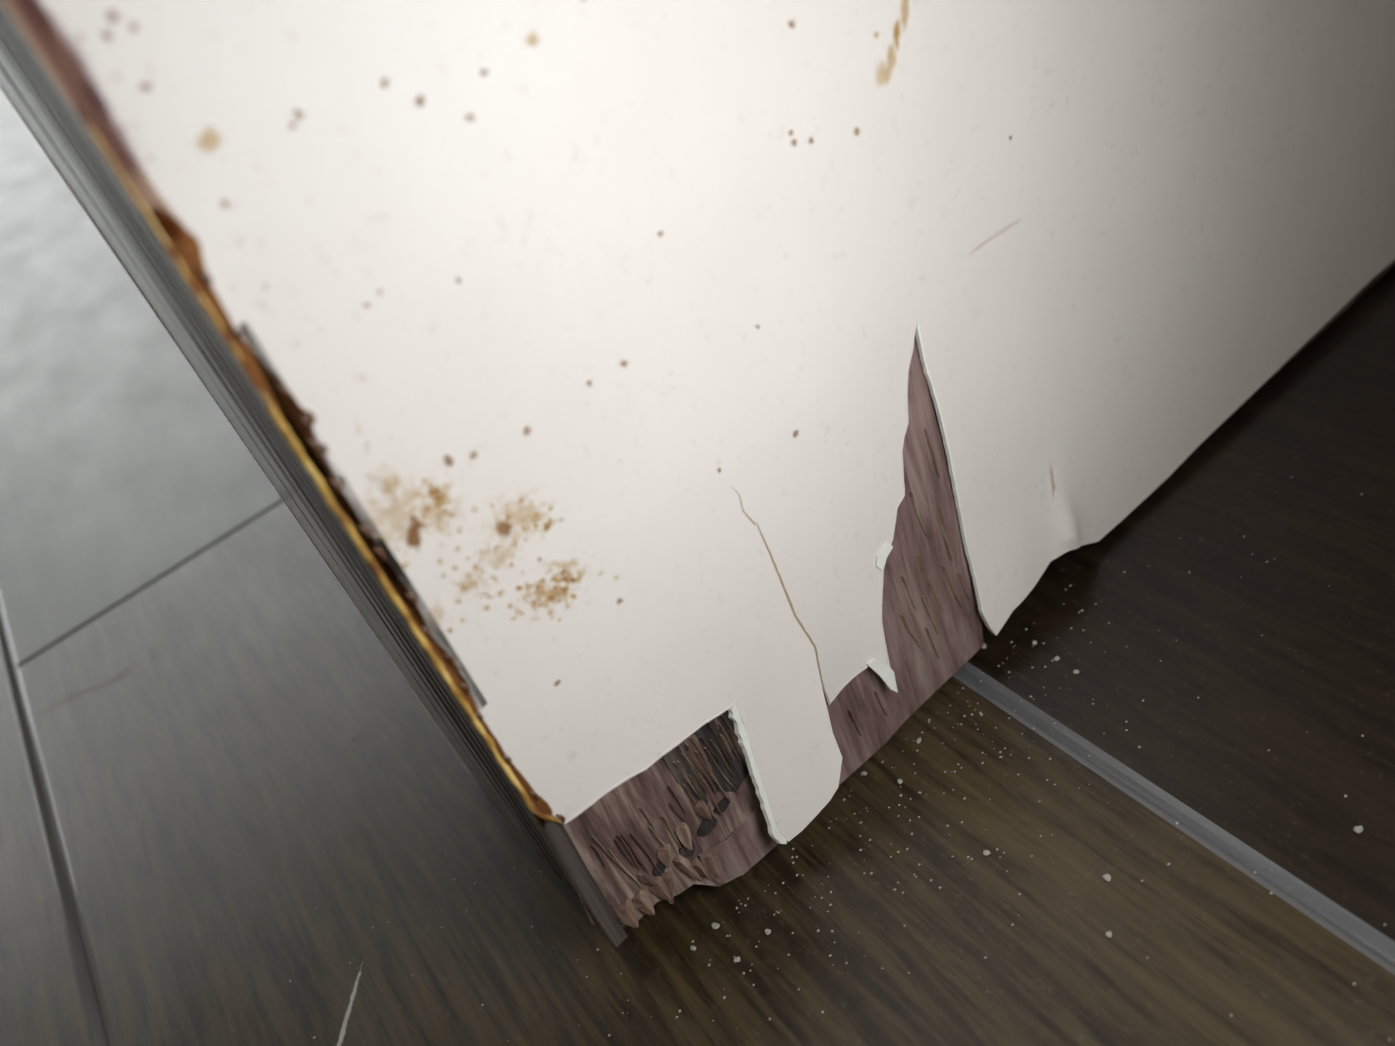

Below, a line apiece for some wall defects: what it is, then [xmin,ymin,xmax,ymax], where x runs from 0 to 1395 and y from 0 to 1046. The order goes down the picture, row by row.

crack [731,486,830,703]
peeling [875,542,893,570]
peeling [866,658,898,693]
peeling [618,797,775,928]